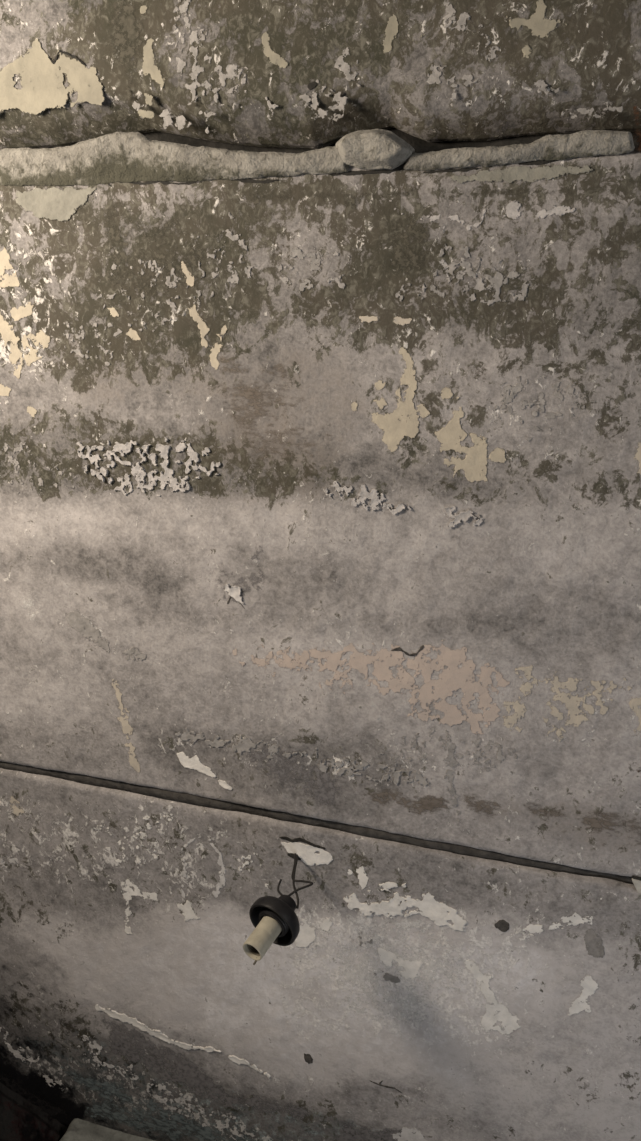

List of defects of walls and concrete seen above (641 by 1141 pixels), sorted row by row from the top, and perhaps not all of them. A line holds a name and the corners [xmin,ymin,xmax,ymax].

peeling [0,38,104,115]
crack [108,180,201,188]
leakage [104,203,205,302]
crack [235,177,279,185]
crack [143,128,572,176]
leakage [343,189,486,277]
leakage [482,189,539,220]
leakage [535,187,575,219]
crack [631,132,641,151]
peeling [0,212,256,396]
peeling [0,432,221,496]
peeling [343,866,467,931]